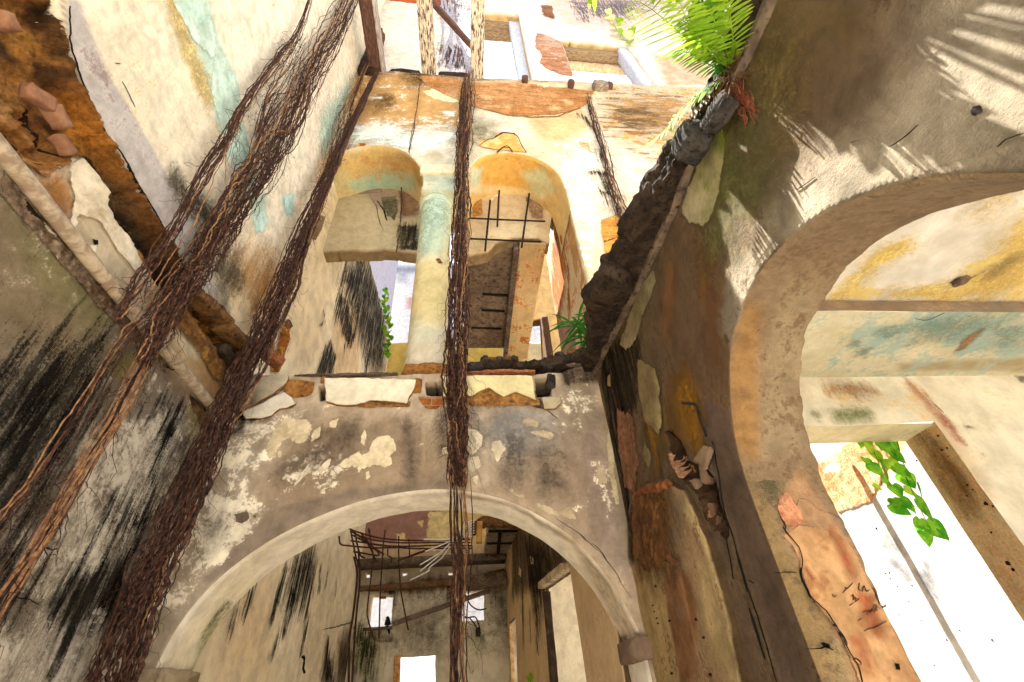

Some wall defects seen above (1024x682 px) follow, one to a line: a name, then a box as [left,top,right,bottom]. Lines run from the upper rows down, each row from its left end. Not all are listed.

spalling [0,0,192,295]
flaking render [349,33,595,154]
mould [316,261,387,374]
damp [0,299,201,682]
peeling [268,430,396,485]
flaking render [359,378,446,409]
flaking render [463,362,556,440]
spalling [596,409,729,539]
damp [227,583,257,640]
damp [267,544,337,662]
damp [319,635,338,682]
crack [712,442,863,682]